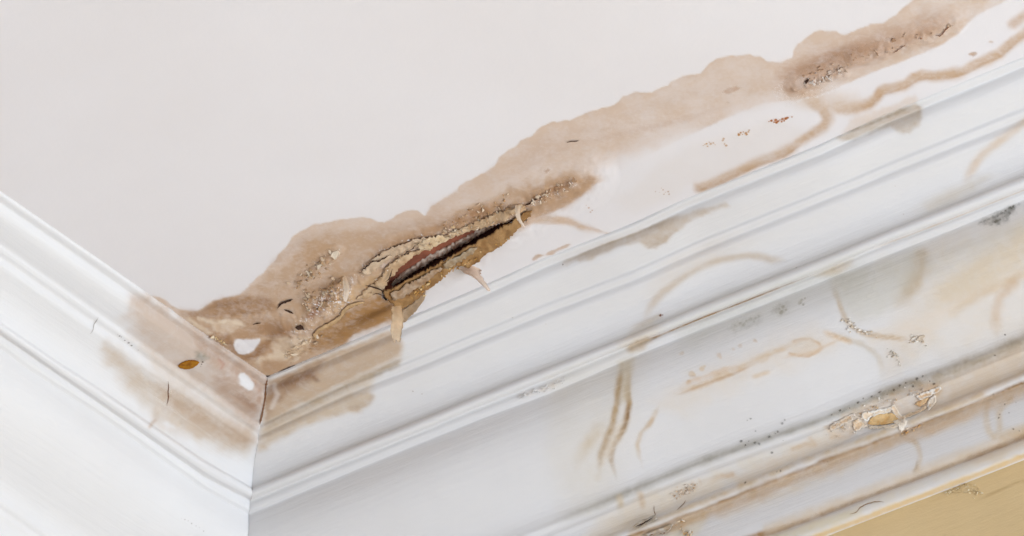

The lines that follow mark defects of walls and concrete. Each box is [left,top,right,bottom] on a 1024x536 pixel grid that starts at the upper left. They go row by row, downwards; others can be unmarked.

flaking render [286,177,577,343]
crack [278,299,364,339]
rust [178,360,199,369]
flaking render [829,385,941,437]
crack [248,365,295,528]